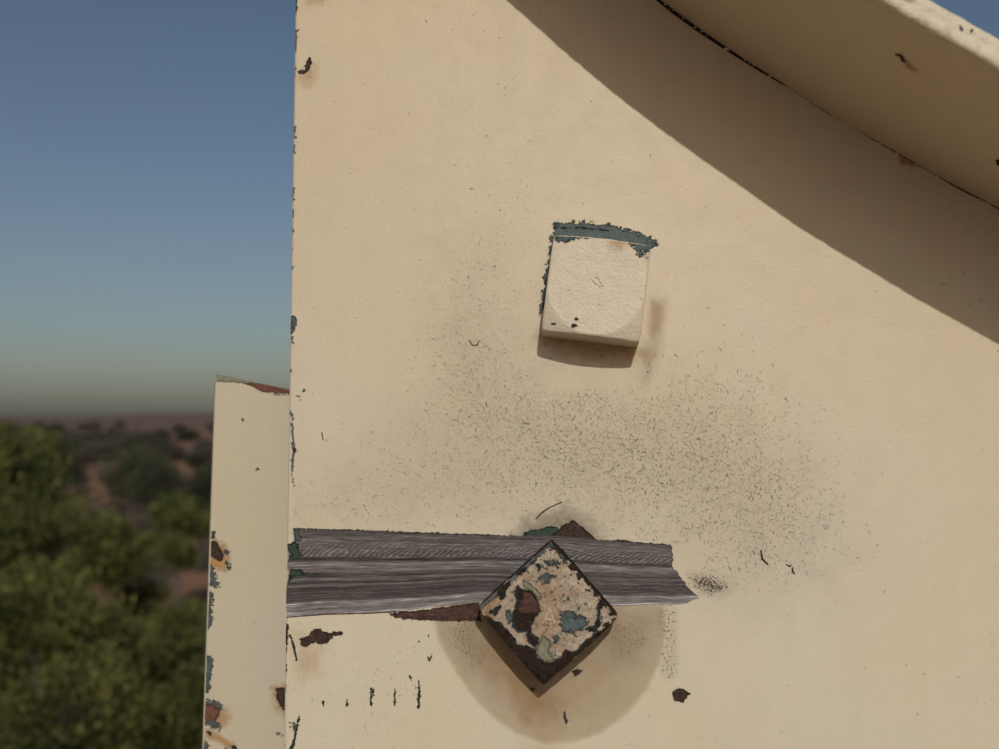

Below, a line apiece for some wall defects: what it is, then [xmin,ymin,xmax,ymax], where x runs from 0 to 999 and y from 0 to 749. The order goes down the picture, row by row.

peeling [539,219,659,316]
rust [209,531,232,589]
peeling [286,623,343,672]
rust [389,563,615,684]
rust [205,698,237,749]
rust [275,687,285,712]
peeling [672,688,691,703]